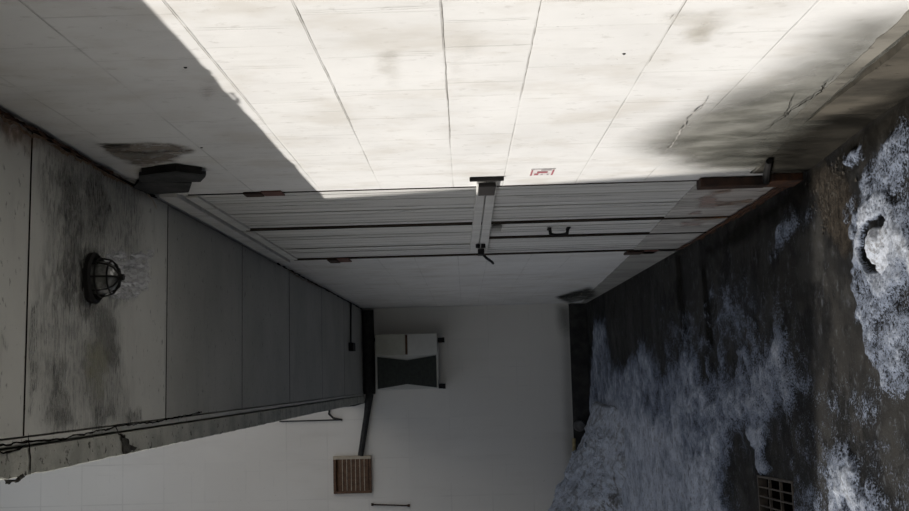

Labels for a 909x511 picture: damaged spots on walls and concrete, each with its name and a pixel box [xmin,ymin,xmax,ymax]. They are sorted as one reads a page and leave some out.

water stain [658,24,909,253]
water stain [30,168,152,422]
crack [0,411,202,473]
spalling [113,425,137,454]